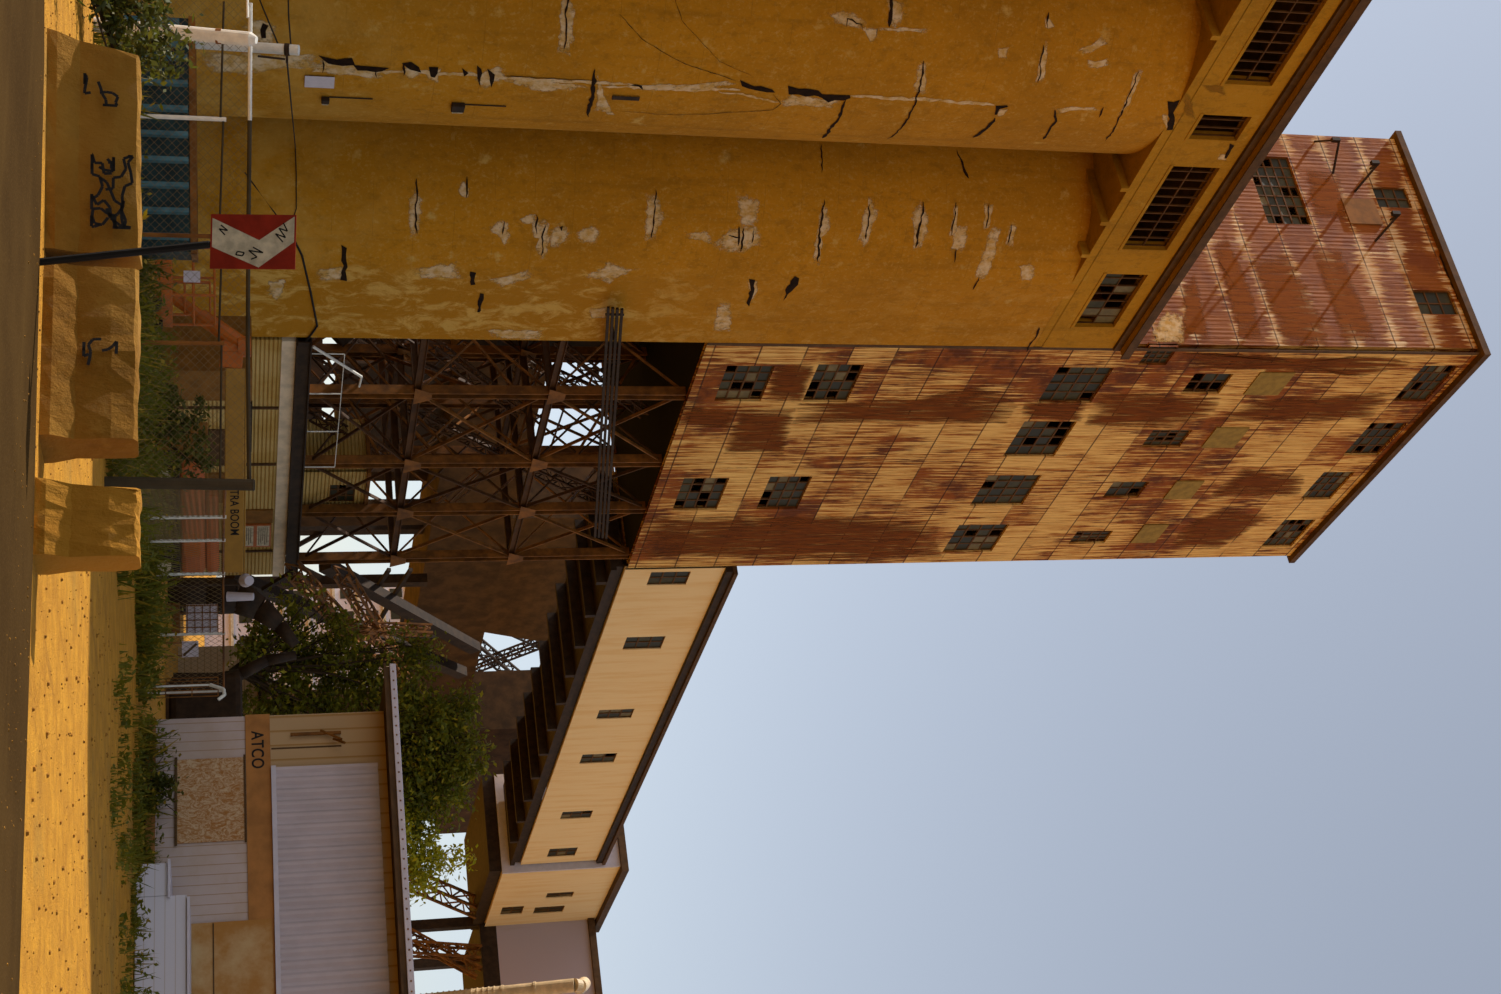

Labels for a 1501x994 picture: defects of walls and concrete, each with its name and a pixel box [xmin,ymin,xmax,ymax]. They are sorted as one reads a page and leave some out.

peeling [203,20,994,108]
crack [507,0,781,117]
crack [1036,12,1143,141]
spalling [491,214,599,257]
spalling [689,197,760,252]
crack [813,100,846,262]
crack [950,106,1016,245]
peeling [419,263,530,312]
corrosion [1183,242,1407,376]
corrosion [681,366,1014,457]
corrosion [1087,393,1389,428]
corrosion [639,516,939,561]